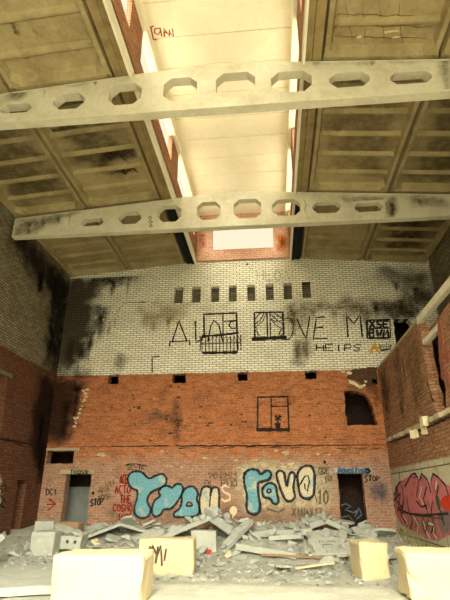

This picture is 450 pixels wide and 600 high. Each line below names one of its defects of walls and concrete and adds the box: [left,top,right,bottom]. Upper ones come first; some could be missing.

crack [336,1,426,44]
water stain [340,268,433,321]
water stain [31,277,122,482]
spalling [341,367,378,395]